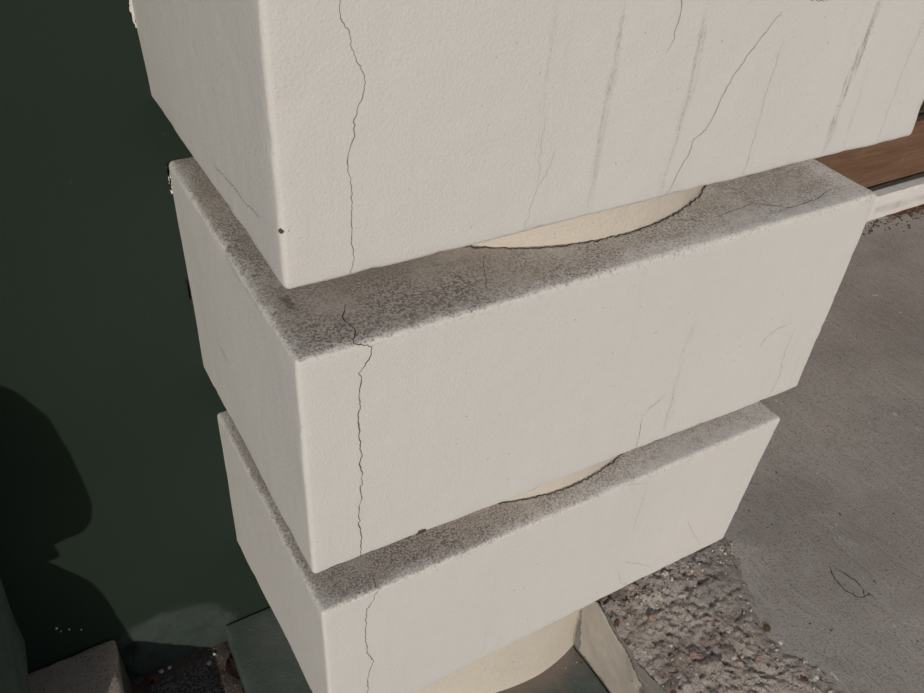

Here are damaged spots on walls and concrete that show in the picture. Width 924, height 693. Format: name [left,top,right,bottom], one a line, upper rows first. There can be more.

crack [339,1,366,273]
crack [465,15,783,287]
crack [713,191,828,218]
crack [342,305,372,556]
crack [365,575,378,692]
spalling [579,536,845,693]